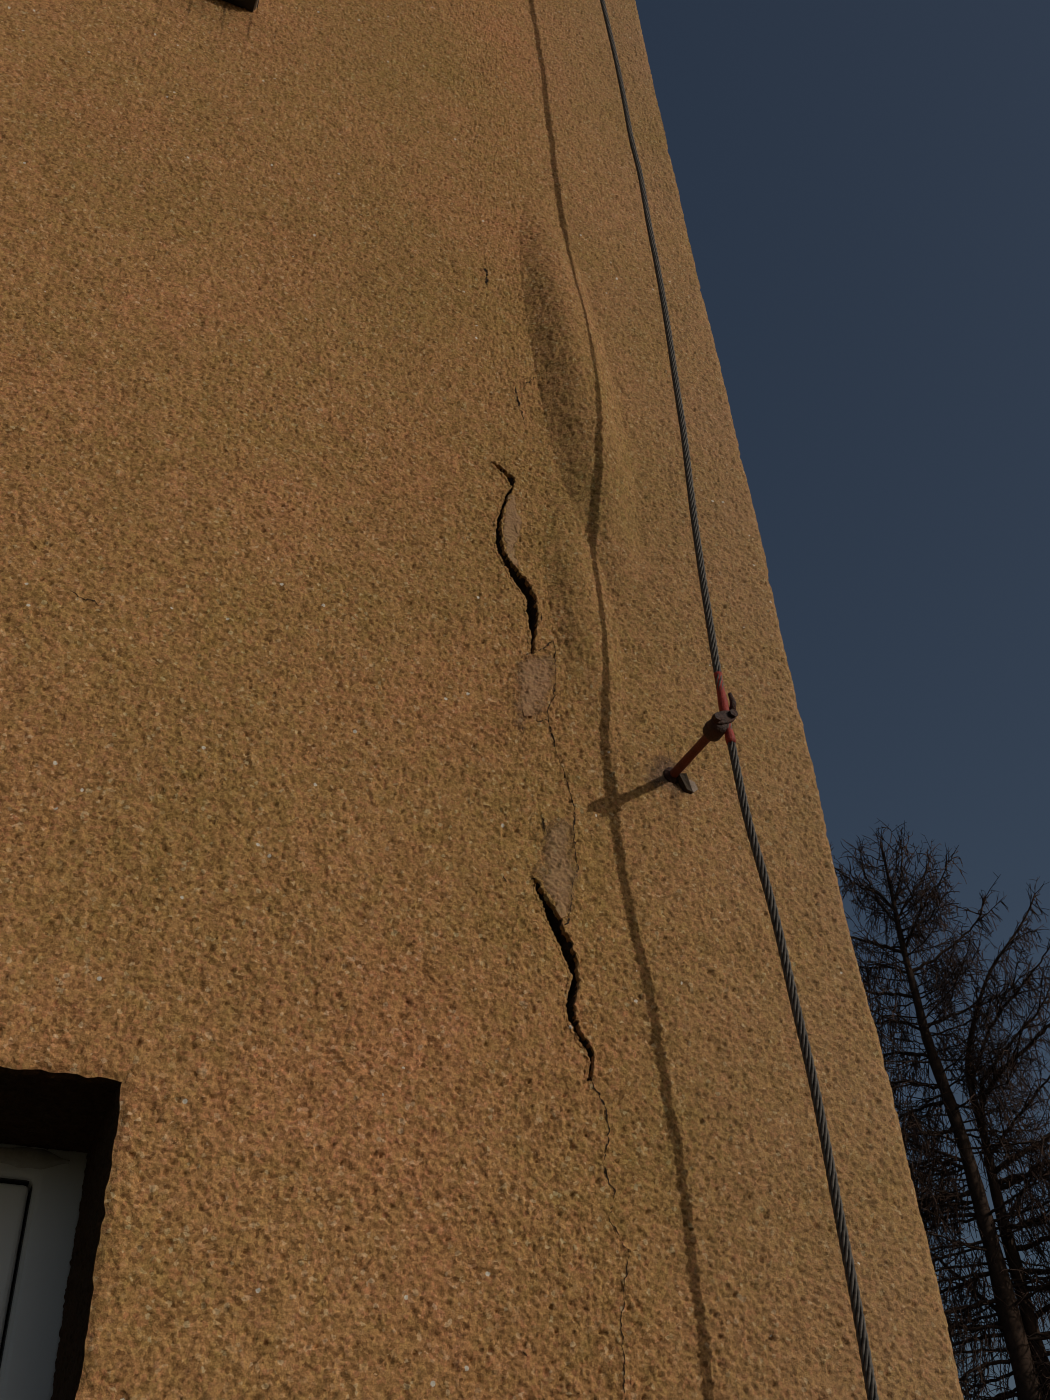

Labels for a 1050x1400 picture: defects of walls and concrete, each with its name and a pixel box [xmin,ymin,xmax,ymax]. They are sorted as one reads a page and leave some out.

crack [490,461,629,1399]